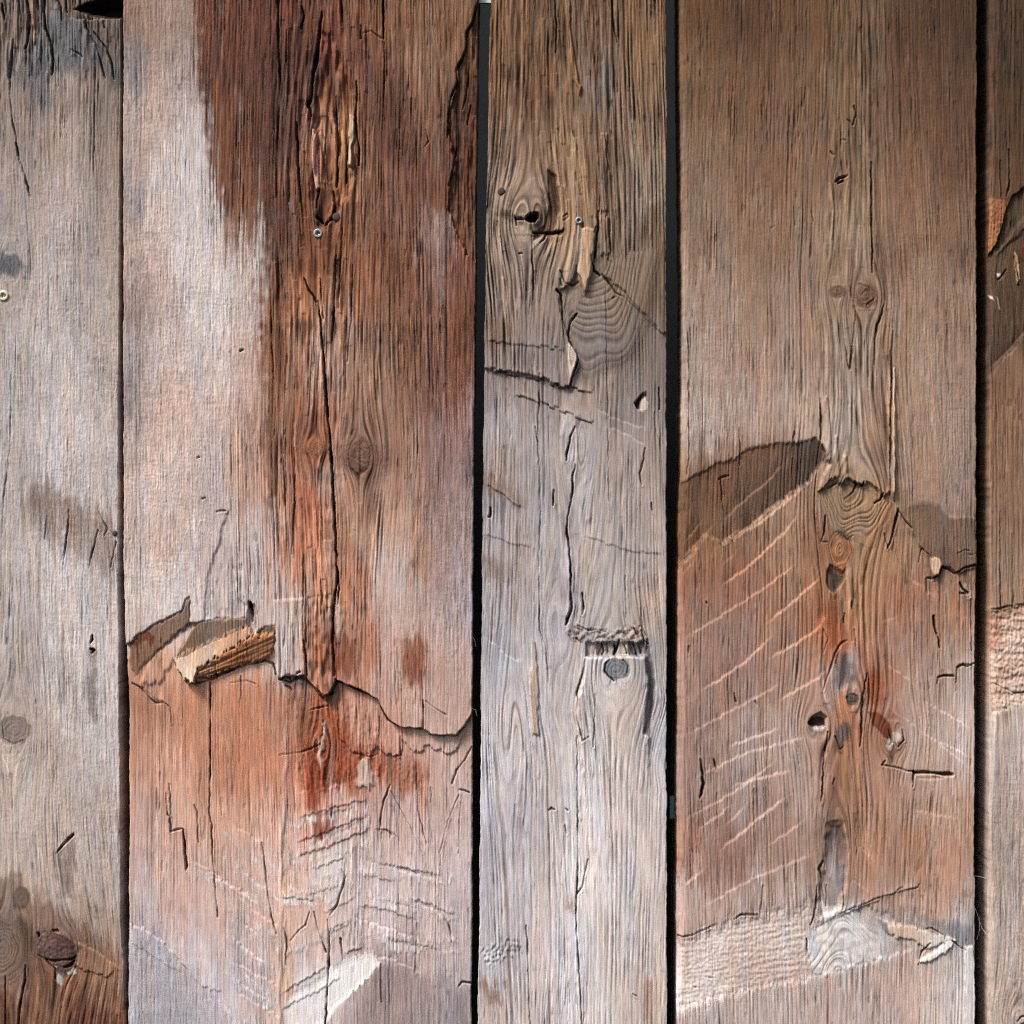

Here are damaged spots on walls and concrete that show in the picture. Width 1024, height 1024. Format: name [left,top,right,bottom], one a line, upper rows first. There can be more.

crack [427,8,477,177]
crack [592,262,620,295]
spalling [987,188,1024,263]
crack [319,311,340,653]
crack [501,216,608,641]
peeling [931,557,943,576]
crack [936,566,968,594]
spalling [129,598,306,684]
spalling [565,624,655,736]
crack [331,680,473,793]
peeling [886,732,902,751]
spalling [676,900,975,1024]